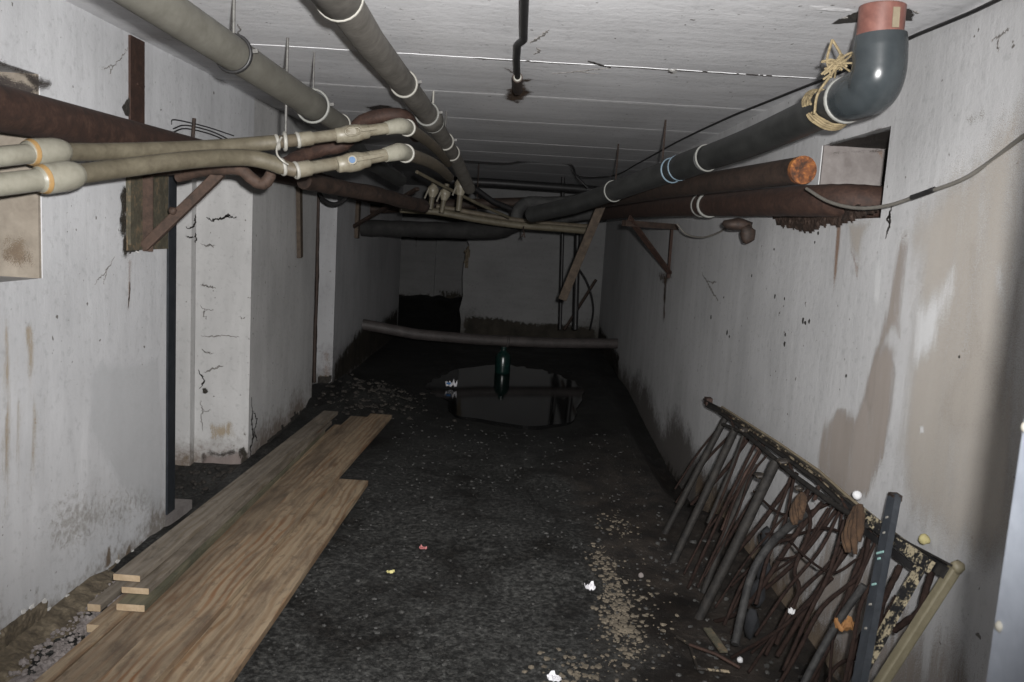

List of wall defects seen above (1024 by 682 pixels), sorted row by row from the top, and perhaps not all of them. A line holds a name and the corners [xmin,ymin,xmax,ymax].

crack [185,214,236,248]
crack [884,207,892,239]
crack [198,284,239,430]
crack [250,397,258,456]
leakage [817,85,1024,581]
leakage [695,461,875,682]